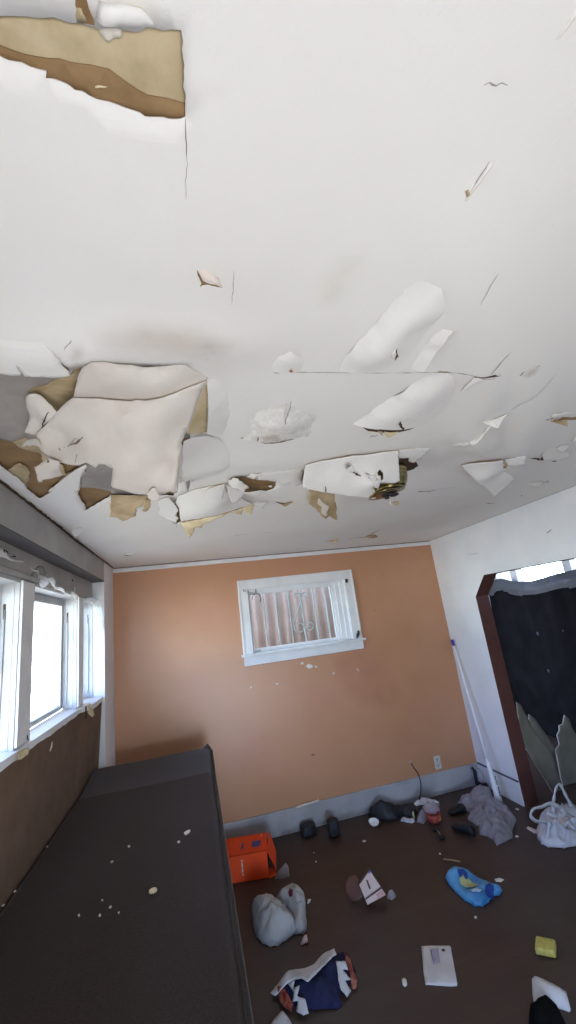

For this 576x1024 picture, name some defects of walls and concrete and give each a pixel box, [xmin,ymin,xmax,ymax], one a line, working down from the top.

crack [182,119,190,185]
peeling [246,470,304,486]
peeling [398,448,431,471]
peeling [147,488,179,527]